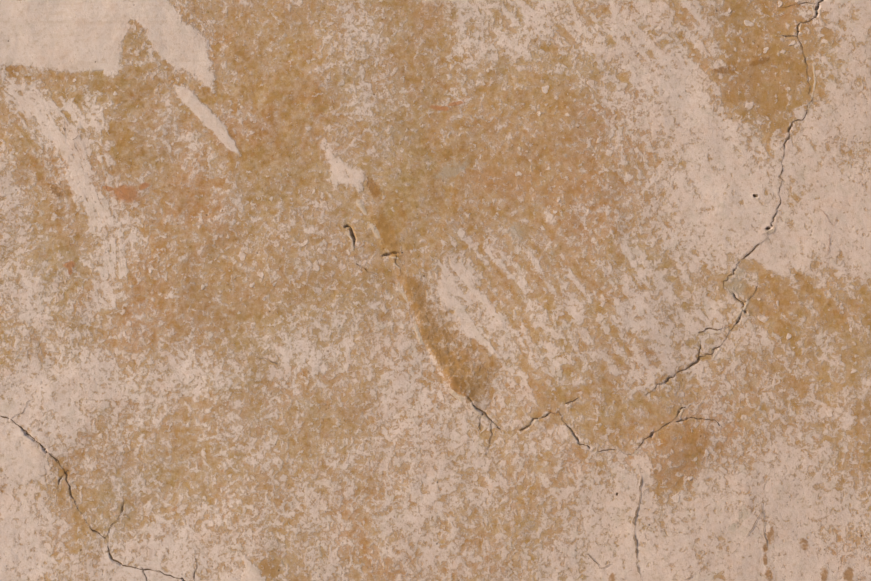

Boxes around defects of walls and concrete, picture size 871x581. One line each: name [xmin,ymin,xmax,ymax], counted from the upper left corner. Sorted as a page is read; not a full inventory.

crack [345,226,403,275]
crack [646,0,824,395]
crack [1,401,197,581]
crack [468,397,720,581]
crack [685,468,772,580]